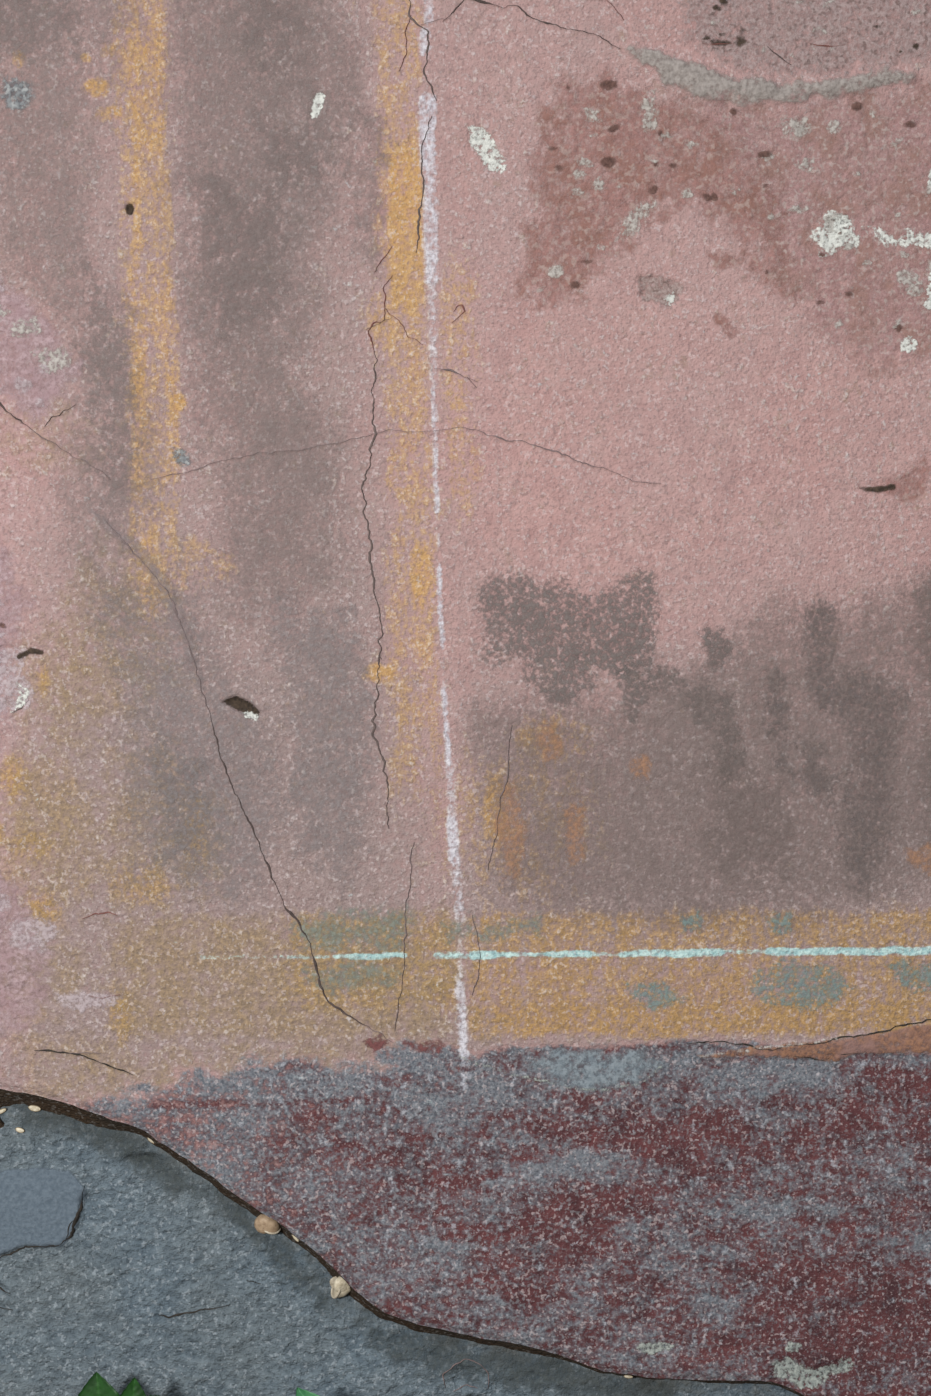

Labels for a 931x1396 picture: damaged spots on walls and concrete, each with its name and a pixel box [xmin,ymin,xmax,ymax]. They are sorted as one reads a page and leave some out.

crack [0,402,111,480]
crack [105,0,661,1042]
peeling [0,549,43,713]
spalling [224,696,259,721]
damp [492,611,931,927]
peeling [0,875,115,1029]
peeling [711,1025,931,1061]
spalling [0,1089,853,1396]